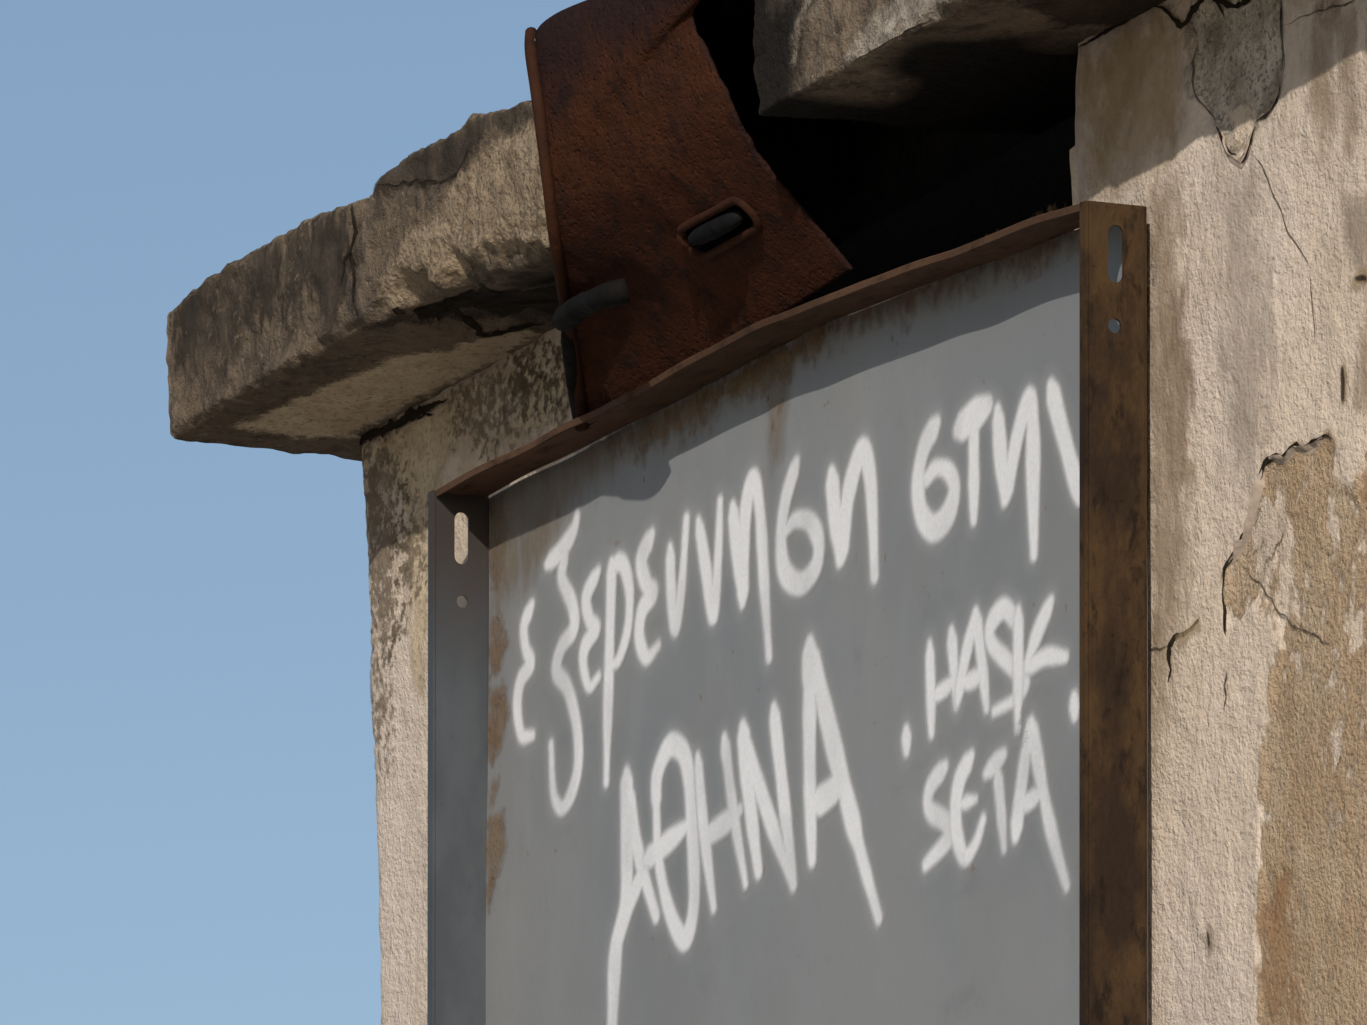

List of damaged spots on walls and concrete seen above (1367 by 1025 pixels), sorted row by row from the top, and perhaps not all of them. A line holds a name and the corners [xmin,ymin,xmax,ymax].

spalling [1184,0,1283,168]
crack [1282,0,1354,26]
crack [340,206,559,338]
crack [1251,154,1315,339]
peeling [1221,429,1367,1025]